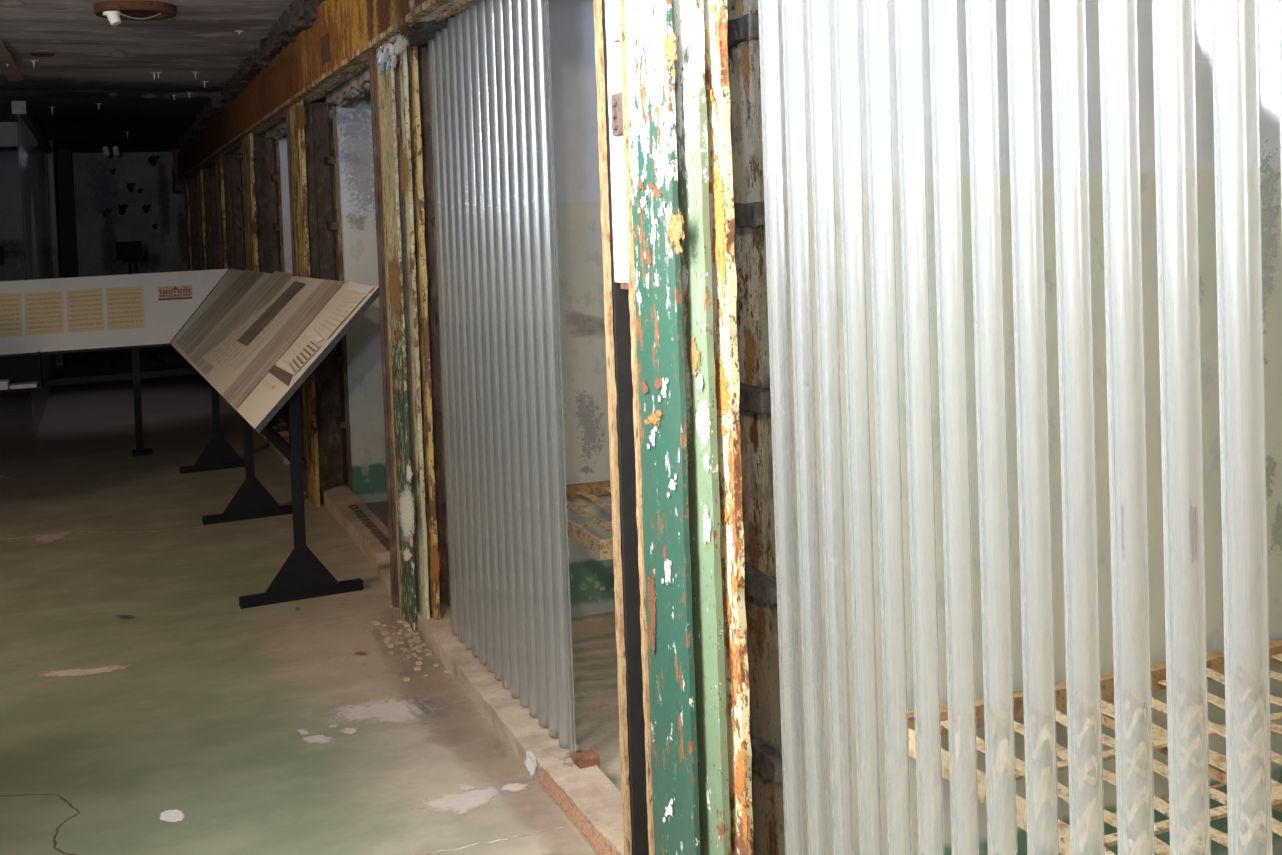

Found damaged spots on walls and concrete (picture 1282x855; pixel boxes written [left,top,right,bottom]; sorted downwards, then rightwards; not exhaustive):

corrosion [366,0,426,53]
peeling [707,124,718,359]
corrosion [709,142,728,320]
water stain [1260,157,1280,333]
peeling [680,211,711,471]
corrosion [687,336,733,436]
corrosion [749,416,758,454]
peeling [397,467,415,561]
peeling [703,507,712,542]
water stain [1266,456,1282,549]
crack [0,794,80,855]
peeling [418,750,622,855]